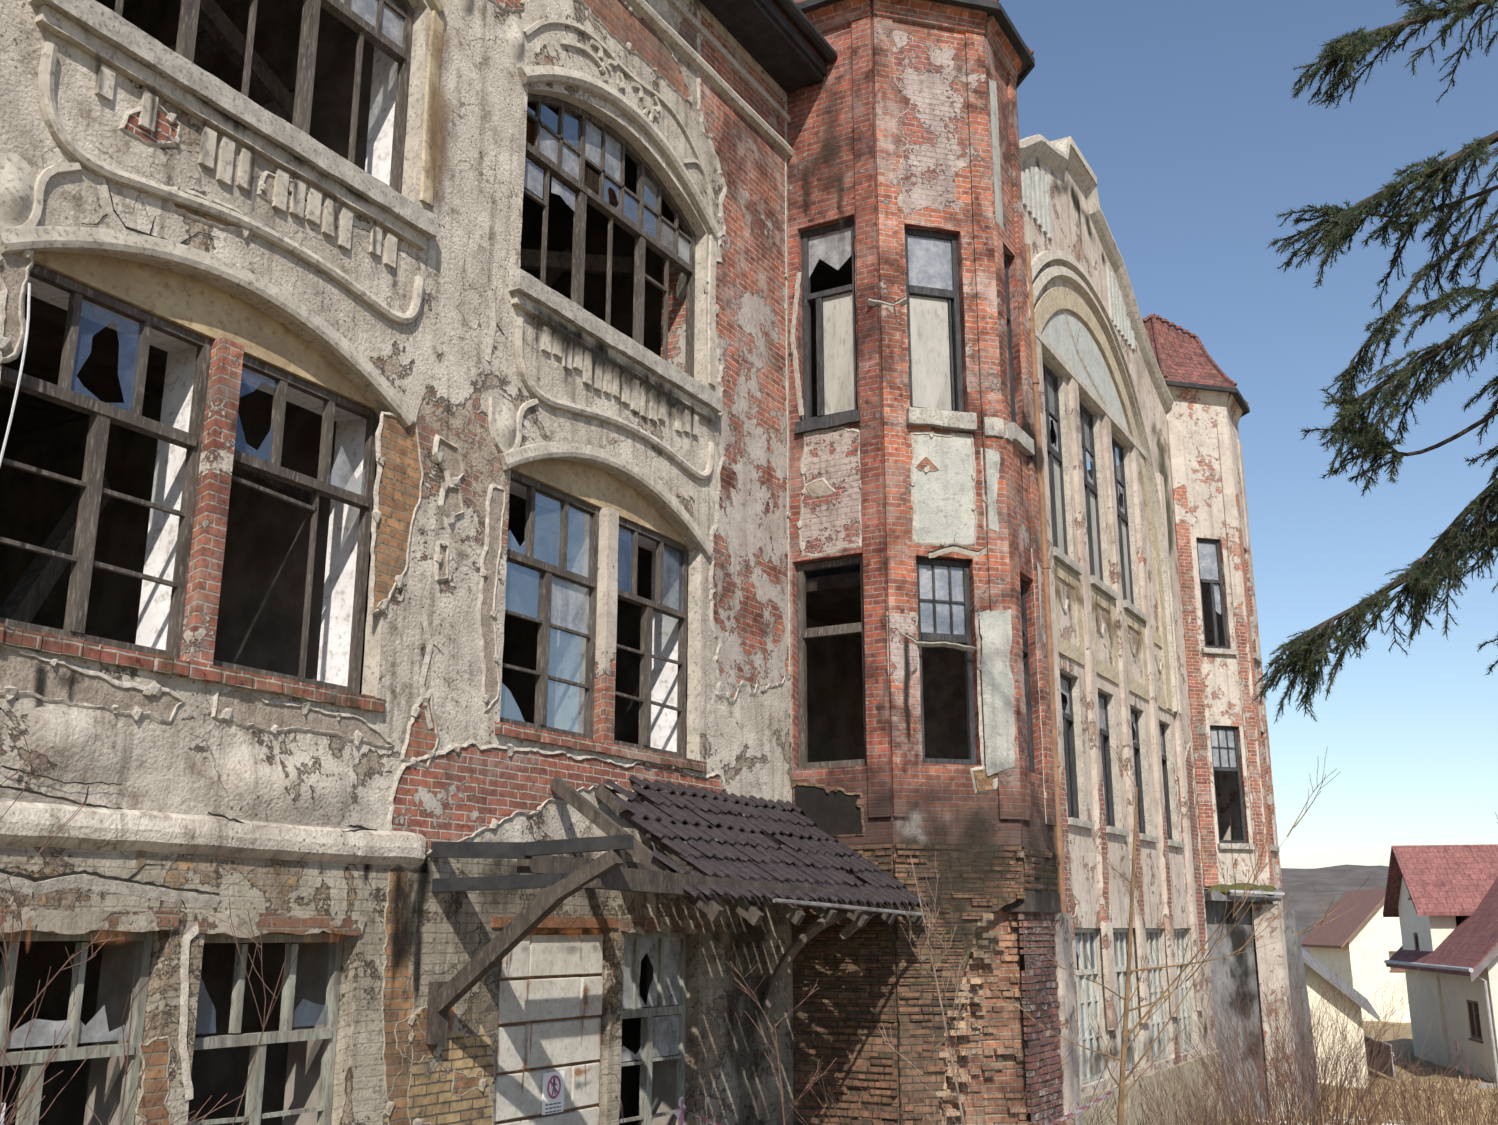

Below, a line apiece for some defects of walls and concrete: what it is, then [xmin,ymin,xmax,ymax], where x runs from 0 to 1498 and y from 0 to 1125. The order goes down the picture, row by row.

flaking render [118,103,182,148]
flaking render [893,30,966,215]
flaking render [573,0,862,705]
flaking render [369,411,465,615]
flaking render [476,483,506,713]
crack [327,824,378,832]
water stain [392,850,430,995]
flaking render [210,685,730,1125]
water stain [908,810,995,946]
water stain [1036,841,1059,913]
flaking render [1158,540,1217,961]
flaking render [1232,601,1268,872]